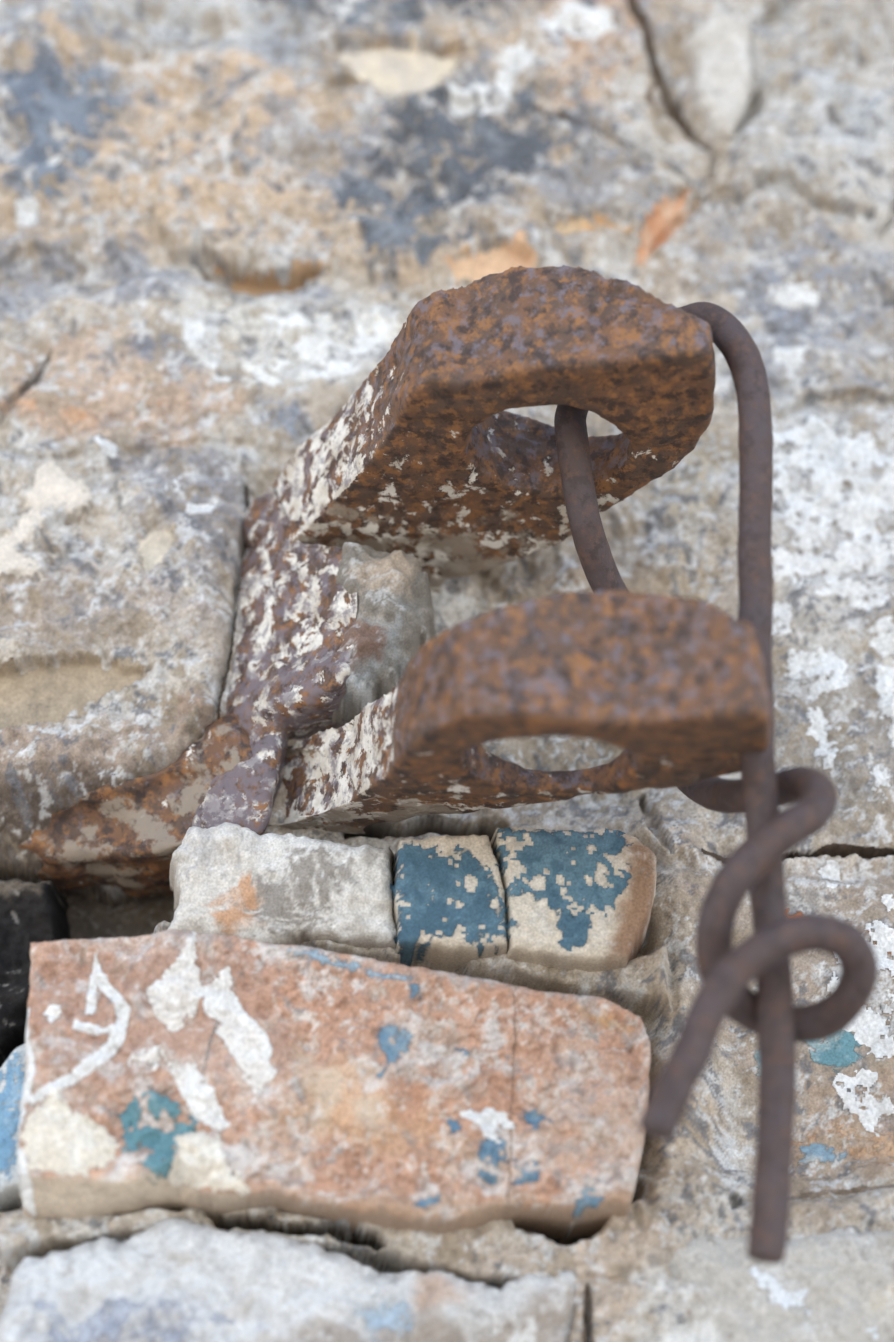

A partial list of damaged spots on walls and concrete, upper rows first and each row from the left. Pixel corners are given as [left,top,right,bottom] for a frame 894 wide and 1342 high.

crack [532,0,714,186]
peeling [773,345,809,371]
peeling [766,279,821,310]
peeling [772,412,894,769]
peeling [287,828,633,998]
crack [701,848,727,863]
crack [784,843,894,859]
peeling [0,953,251,1217]
peeling [146,931,277,1097]
peeling [446,1107,552,1185]
crack [791,1184,894,1199]
peeling [806,894,894,1137]